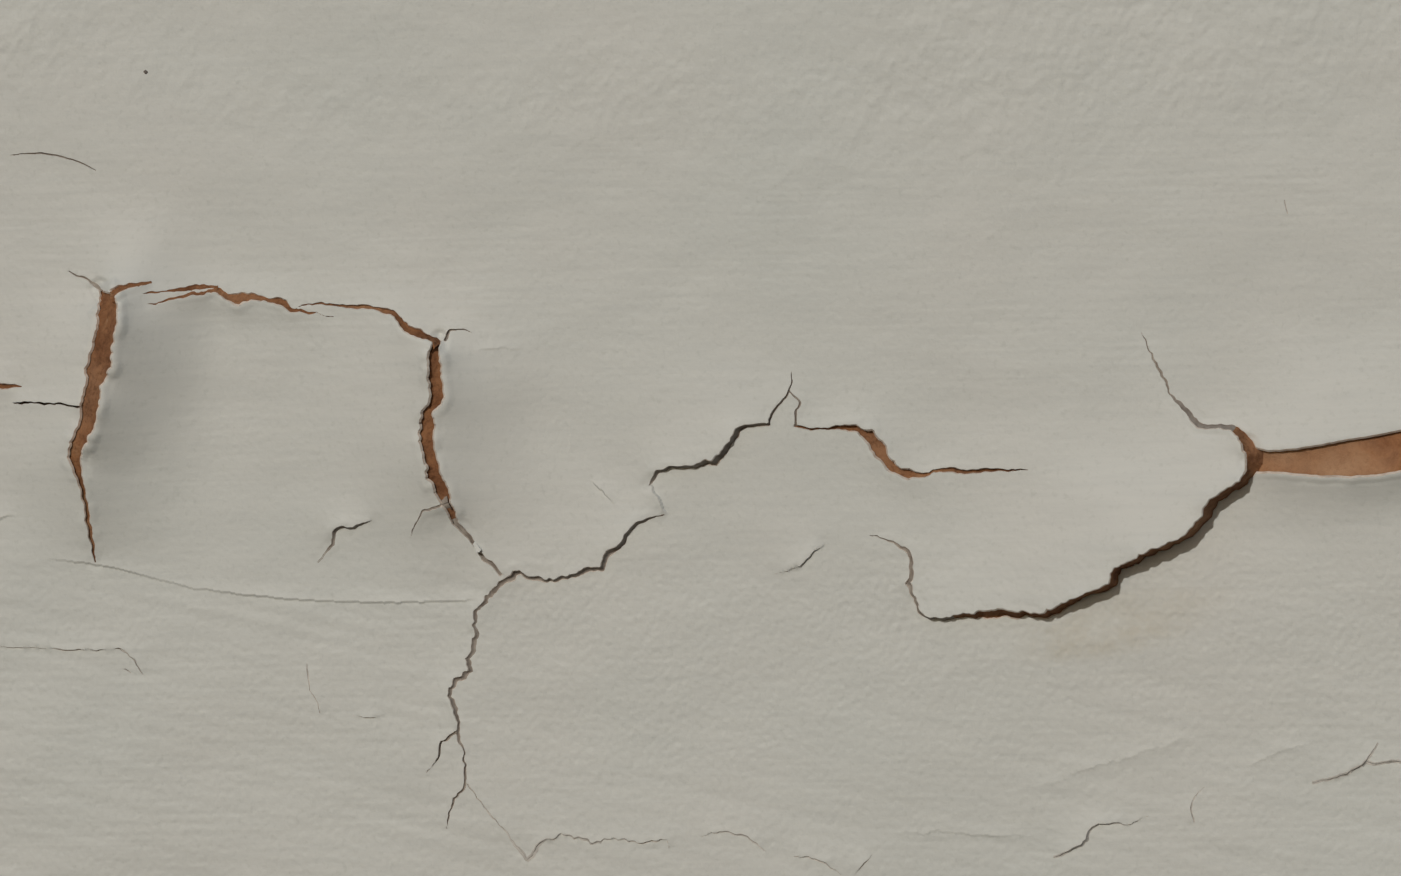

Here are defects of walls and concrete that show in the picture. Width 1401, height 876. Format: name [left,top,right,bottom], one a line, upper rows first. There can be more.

peeling [0,205,796,597]
crack [788,388,1026,494]
peeling [866,330,1264,624]
crack [41,555,530,864]